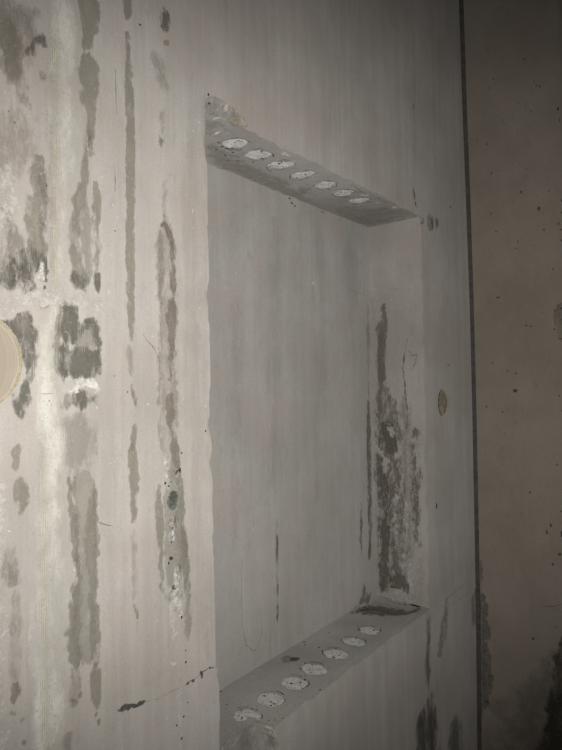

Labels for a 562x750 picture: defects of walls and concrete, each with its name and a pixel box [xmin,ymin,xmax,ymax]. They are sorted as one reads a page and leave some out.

leakage [355,303,424,608]
crack [118,700,145,712]